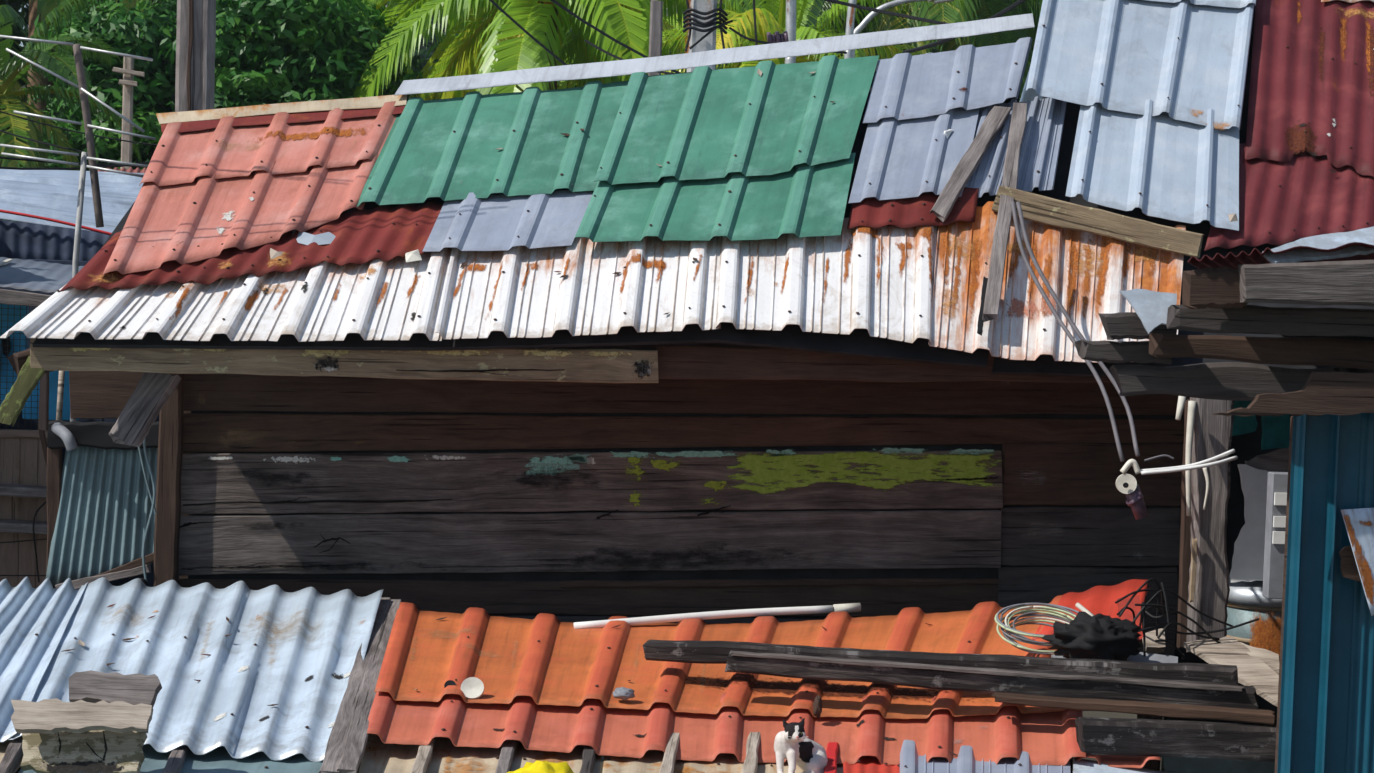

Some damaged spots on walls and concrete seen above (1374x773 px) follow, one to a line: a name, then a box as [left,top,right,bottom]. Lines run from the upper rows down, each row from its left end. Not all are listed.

rust [1318,9,1374,96]
rust [259,126,373,140]
rust [1285,121,1317,157]
rust [167,284,189,320]
rust [245,284,288,310]
rust [361,268,388,305]
rust [453,263,502,310]
rust [521,262,539,291]
rust [620,253,666,293]
rust [823,226,982,321]
rust [1006,239,1163,327]
rust [1339,515,1374,605]